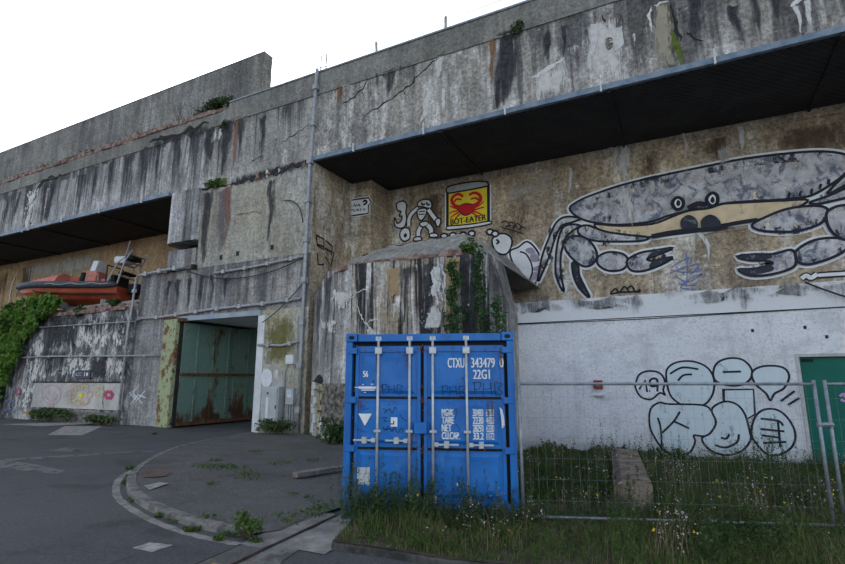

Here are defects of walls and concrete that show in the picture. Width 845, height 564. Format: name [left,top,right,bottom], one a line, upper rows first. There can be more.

peeling [647,1,682,69]
damp [727,5,744,40]
damp [790,0,812,33]
crack [342,51,444,119]
damp [494,31,517,109]
damp [201,116,250,174]
damp [57,158,114,214]
damp [201,188,230,261]
damp [267,179,275,239]
damp [316,276,331,363]
damp [393,261,443,328]
peeling [15,315,129,408]